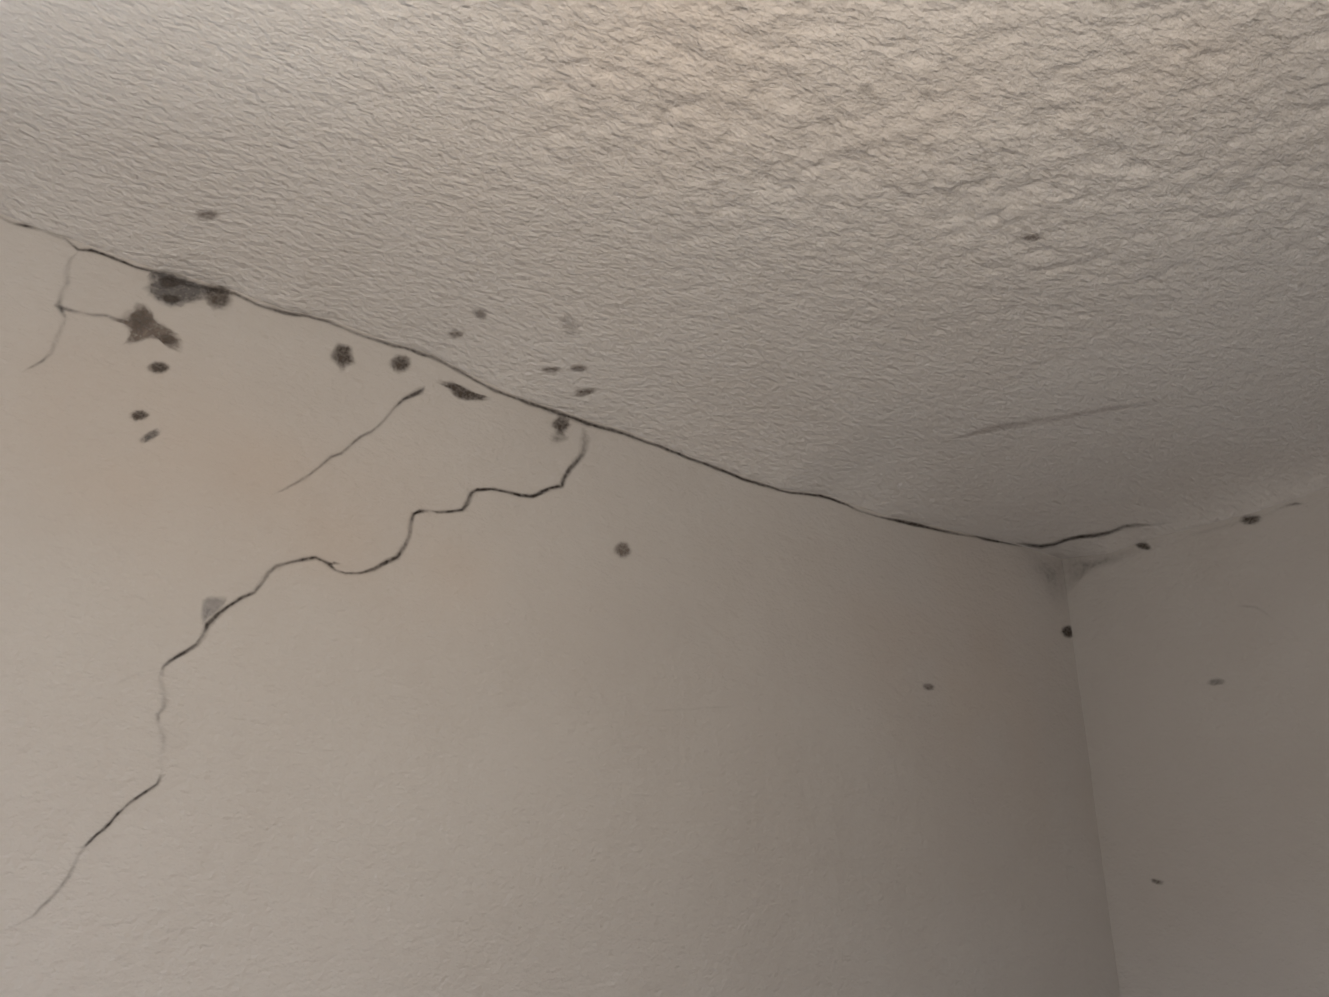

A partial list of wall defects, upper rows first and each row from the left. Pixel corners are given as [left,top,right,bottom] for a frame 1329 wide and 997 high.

crack [75,247,328,322]
crack [384,342,848,506]
crack [296,458,580,574]
crack [887,518,1129,548]
crack [168,593,252,662]
crack [86,784,156,845]